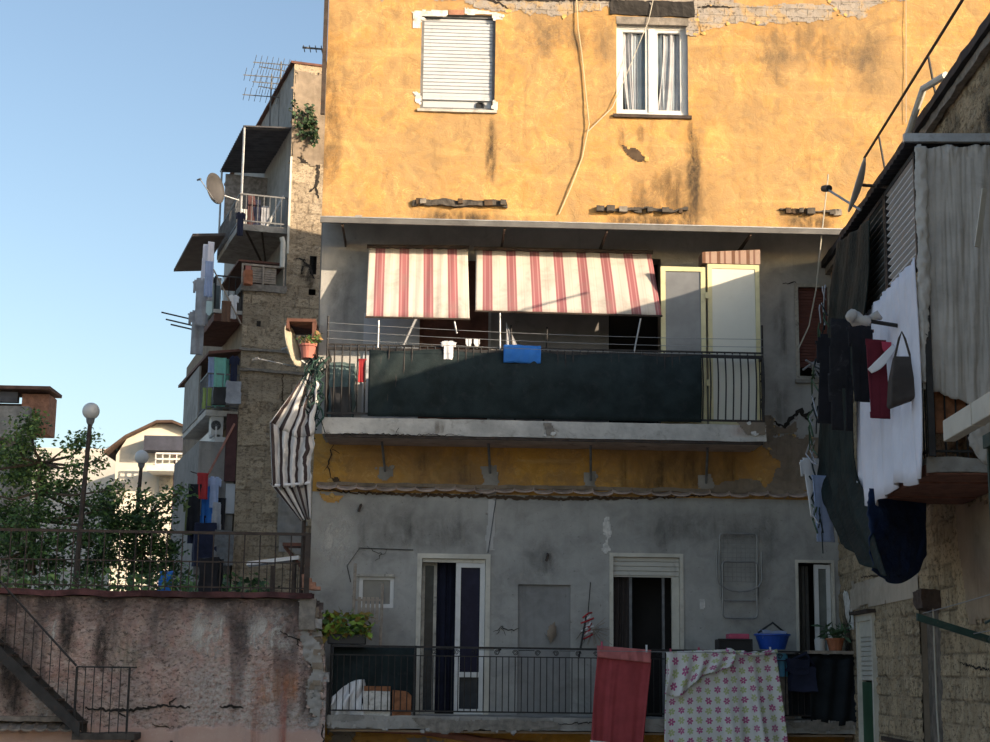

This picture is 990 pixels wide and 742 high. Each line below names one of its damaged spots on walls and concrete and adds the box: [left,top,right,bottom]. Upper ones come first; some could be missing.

flaking render [412,0,610,28]
flaking render [643,0,906,36]
flaking render [622,145,649,162]
crack [289,157,320,198]
flaking render [737,415,818,499]
flaking render [602,517,612,554]
crack [85,698,190,728]
crack [219,702,243,710]